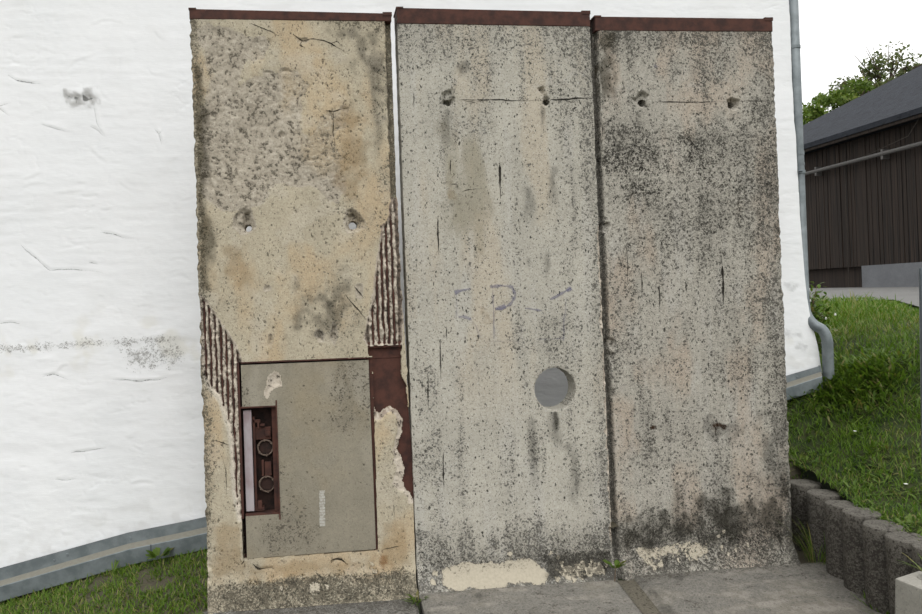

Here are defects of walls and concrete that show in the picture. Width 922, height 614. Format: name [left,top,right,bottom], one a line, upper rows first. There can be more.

spalling [196,23,366,235]
spalling [440,88,458,106]
spalling [631,90,651,109]
spalling [355,196,404,349]
spalling [314,322,338,346]
spalling [199,294,243,519]
spalling [373,406,413,504]